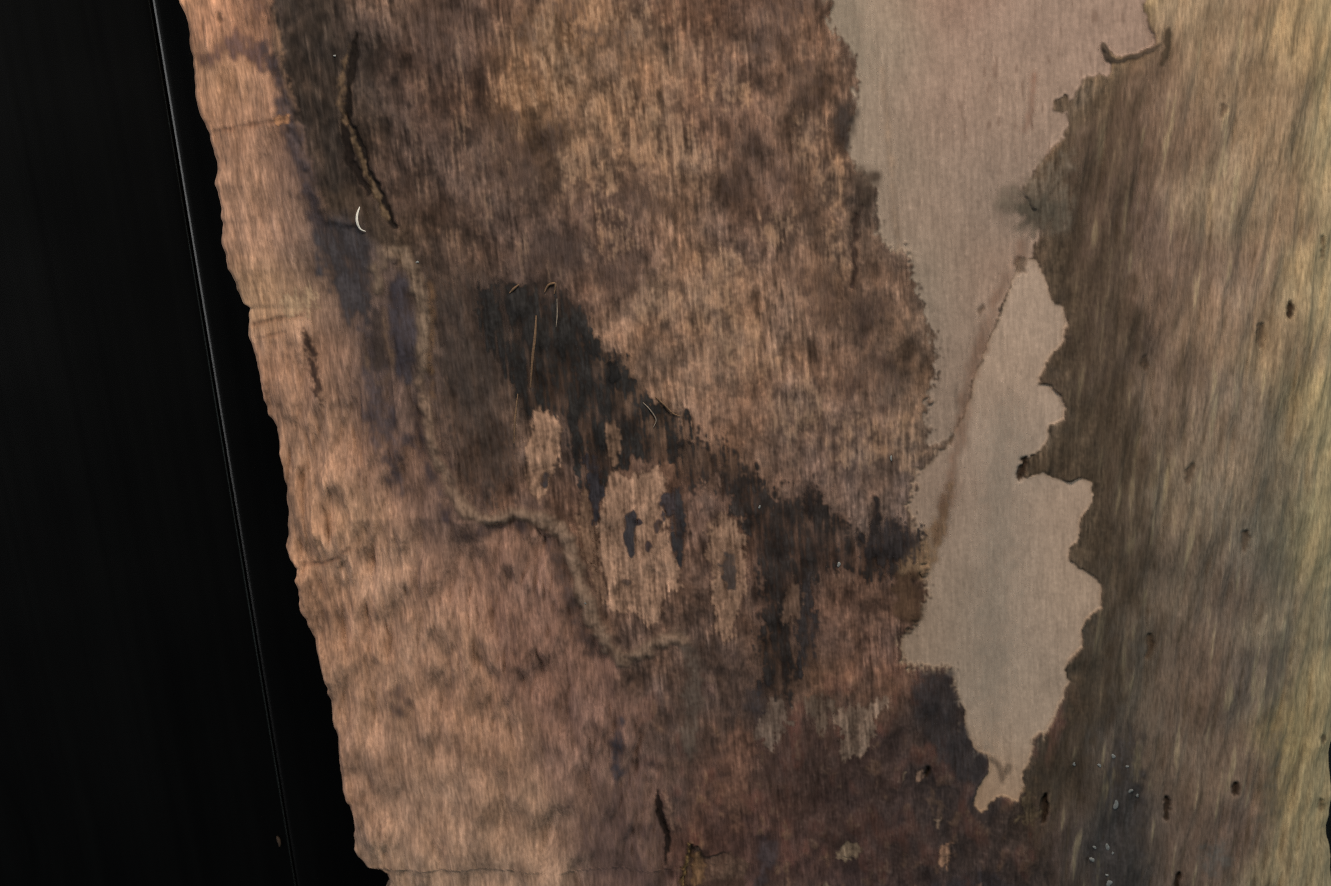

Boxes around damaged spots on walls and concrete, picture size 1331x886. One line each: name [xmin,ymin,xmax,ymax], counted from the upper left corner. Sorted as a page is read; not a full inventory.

crack [328,34,397,235]
water stain [201,29,951,754]
peeling [826,0,1155,812]
spalling [1040,793,1049,822]